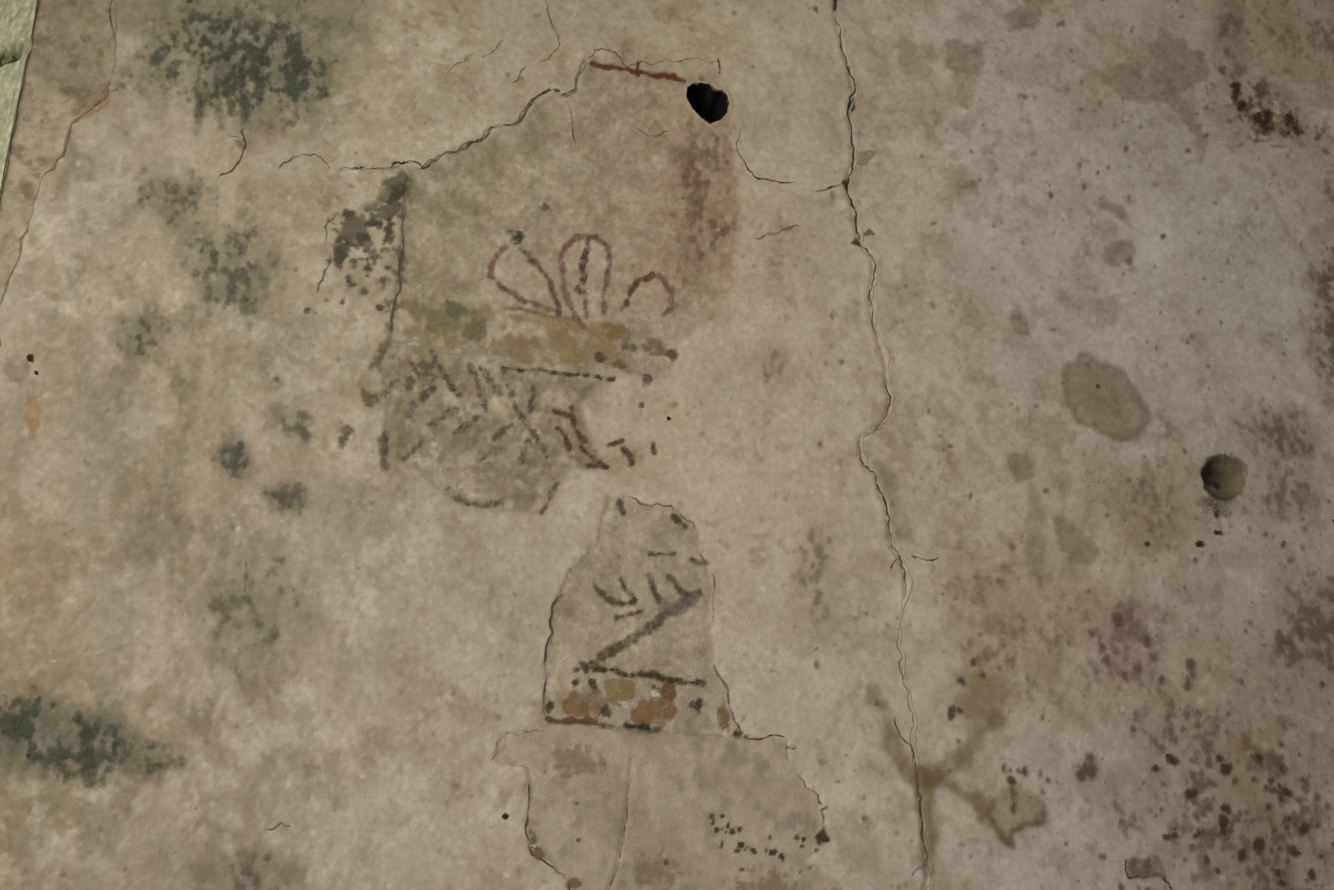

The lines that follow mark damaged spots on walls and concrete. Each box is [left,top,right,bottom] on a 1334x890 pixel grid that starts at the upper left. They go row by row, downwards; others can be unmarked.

crack [219,129,246,176]
water stain [142,2,337,123]
crack [279,3,720,170]
crack [736,138,791,183]
water stain [1212,15,1327,153]
crack [827,0,937,890]
spalling [1195,456,1247,547]
water stain [1089,601,1164,683]
water stain [0,696,162,786]
peeling [495,726,841,890]
water stain [885,618,1057,853]
water stain [1151,699,1334,890]